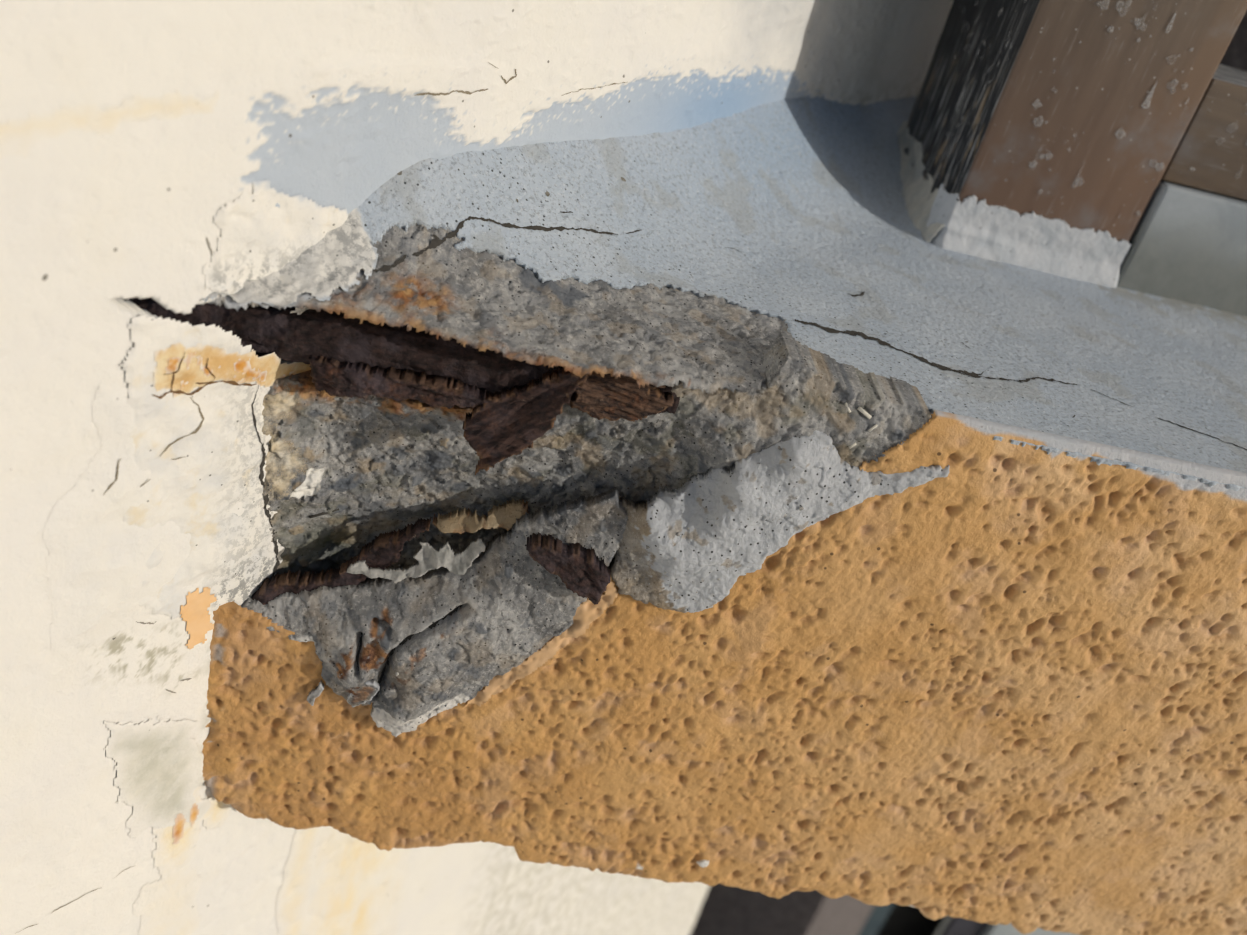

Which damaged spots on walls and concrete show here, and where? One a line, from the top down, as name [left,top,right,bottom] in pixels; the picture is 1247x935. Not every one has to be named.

crack [357,211,640,273]
corrosion [123,297,680,475]
crack [795,319,1247,450]
spalling [120,180,950,737]
corrosion [251,514,435,605]
corrosion [526,532,611,605]